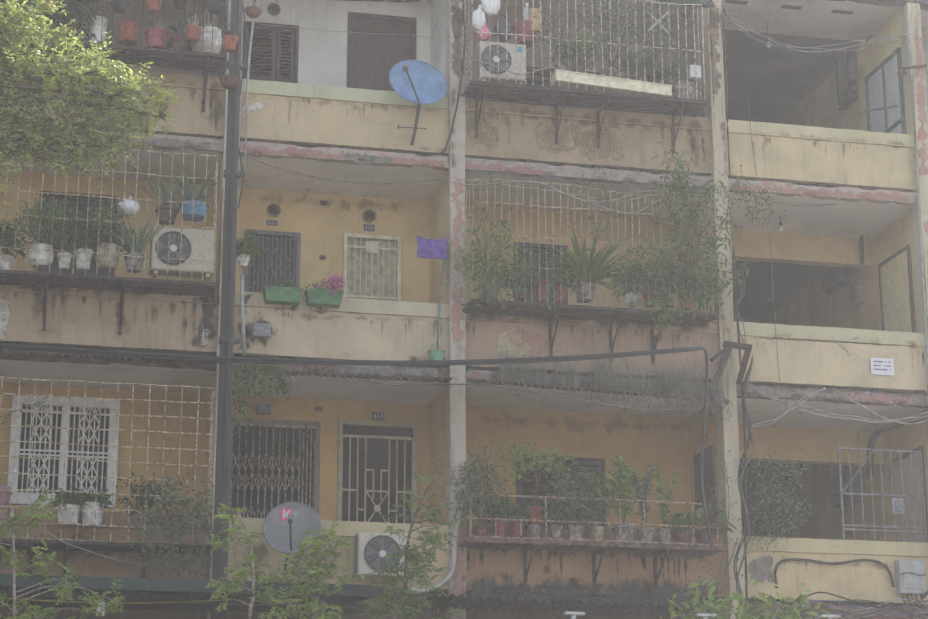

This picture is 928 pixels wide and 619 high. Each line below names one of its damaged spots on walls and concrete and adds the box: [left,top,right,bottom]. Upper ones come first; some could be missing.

damp [183,294,219,348]
spalling [747,386,925,406]